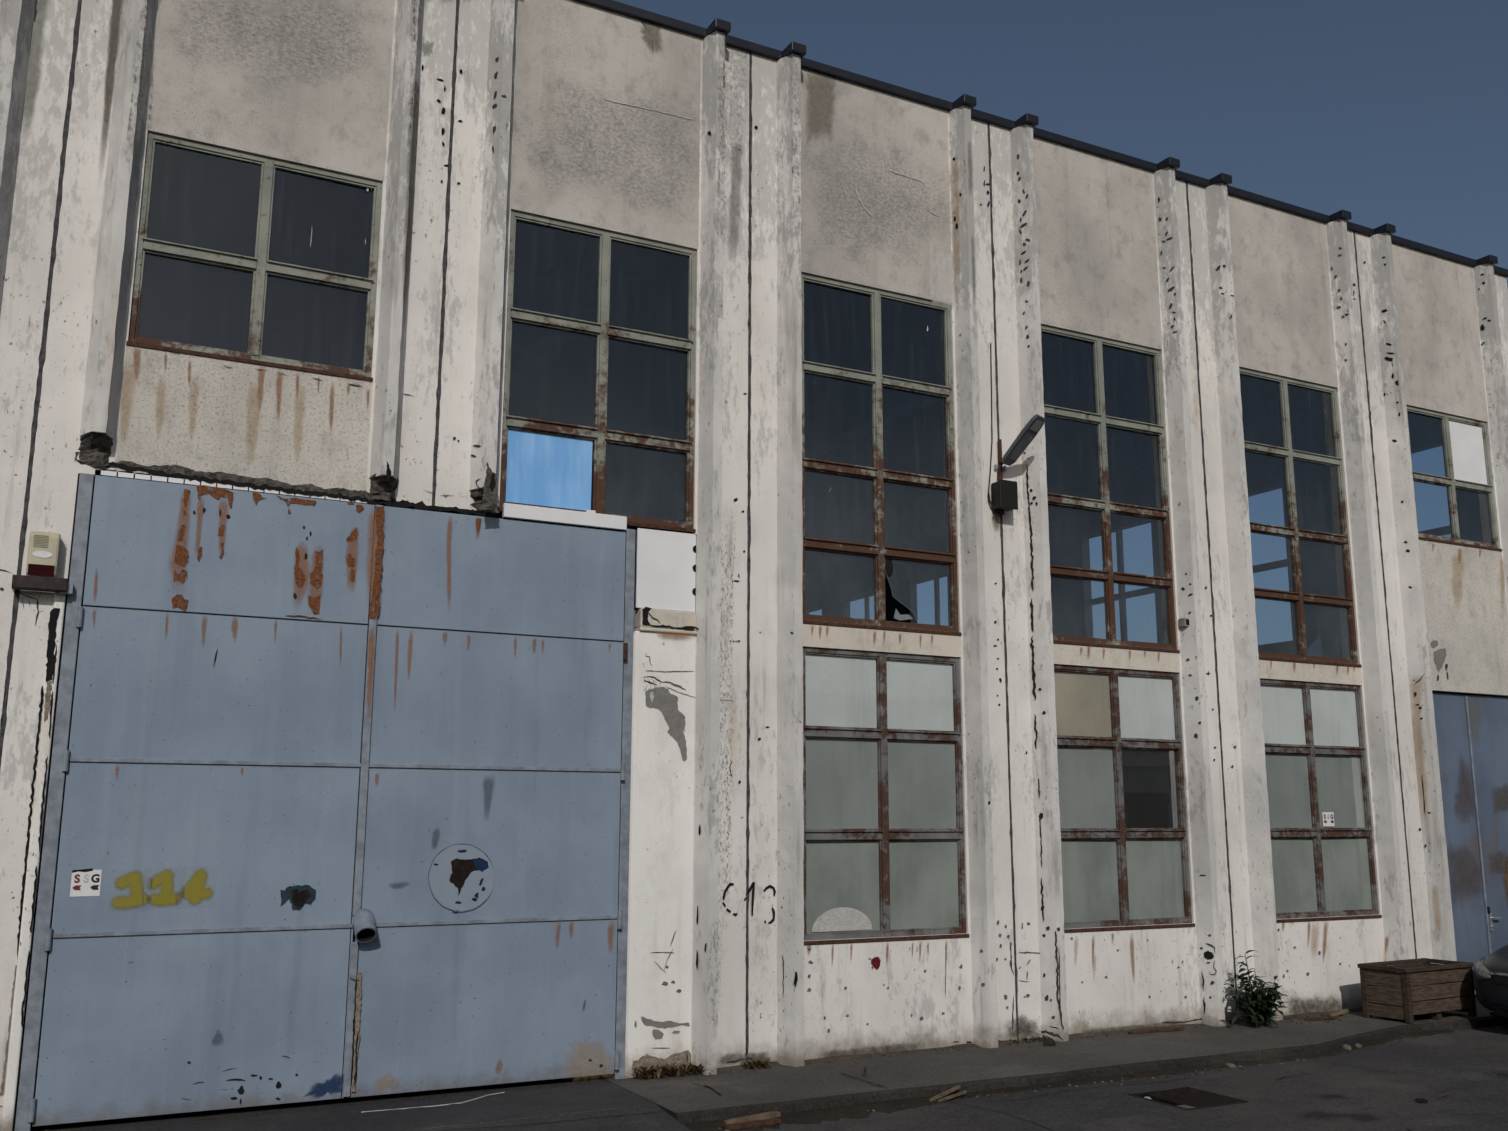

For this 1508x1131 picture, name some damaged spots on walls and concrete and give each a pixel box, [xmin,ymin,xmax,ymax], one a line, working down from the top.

leakage [808,77,833,133]
leakage [404,84,420,289]
rust [259,371,299,411]
rust [253,492,316,514]
spalling [104,437,499,518]
rust [166,485,234,632]
rust [275,526,324,633]
rust [346,502,385,699]
peeling [645,687,687,762]
peeling [280,885,316,910]
peeling [453,850,489,913]